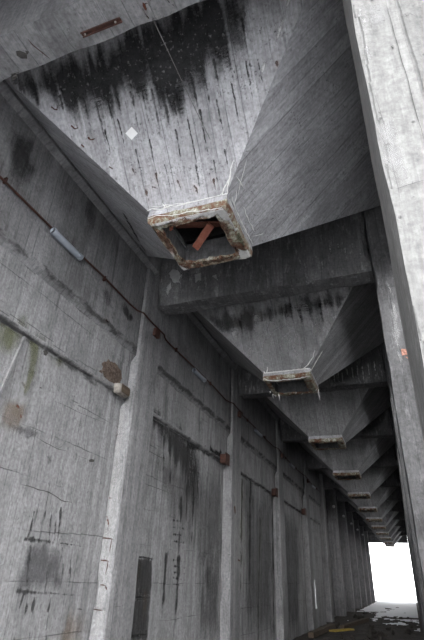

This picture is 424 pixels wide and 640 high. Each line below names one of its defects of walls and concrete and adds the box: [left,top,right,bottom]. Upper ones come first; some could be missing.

damp [12,0,247,186]
corrosion [193,217,237,268]
damp [211,291,343,381]
spalling [99,359,123,384]
damp [147,408,222,547]
damp [24,508,62,568]
damp [162,554,180,613]